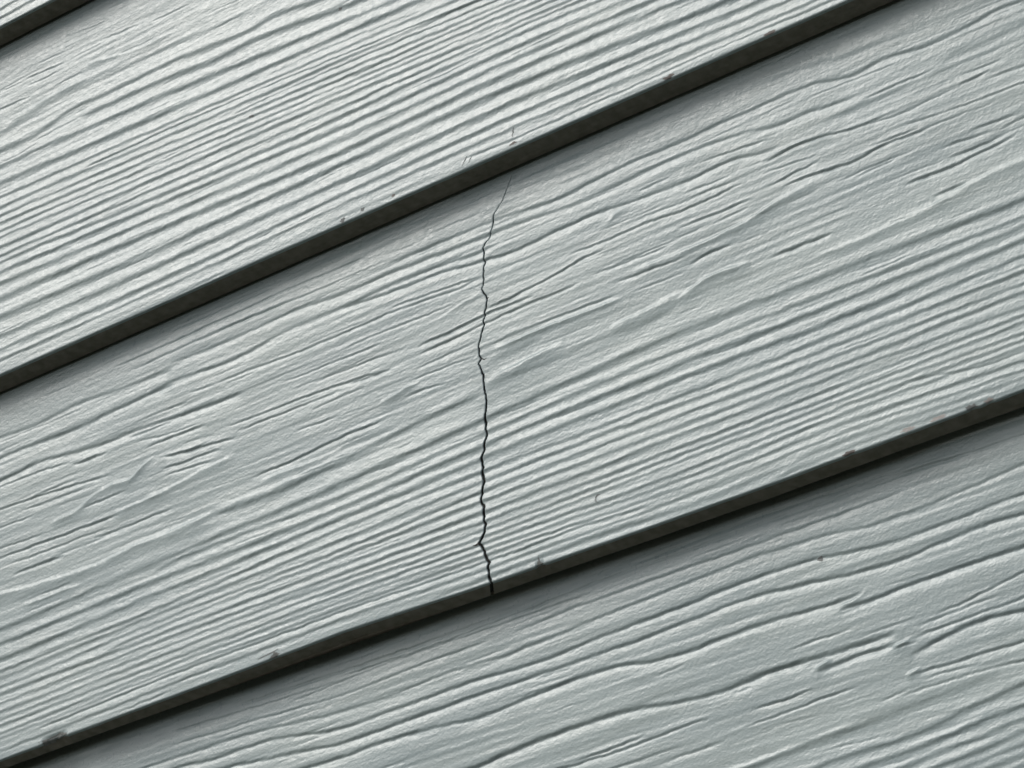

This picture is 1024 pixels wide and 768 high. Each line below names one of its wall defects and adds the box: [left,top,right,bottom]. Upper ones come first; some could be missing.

crack [473,175,512,593]